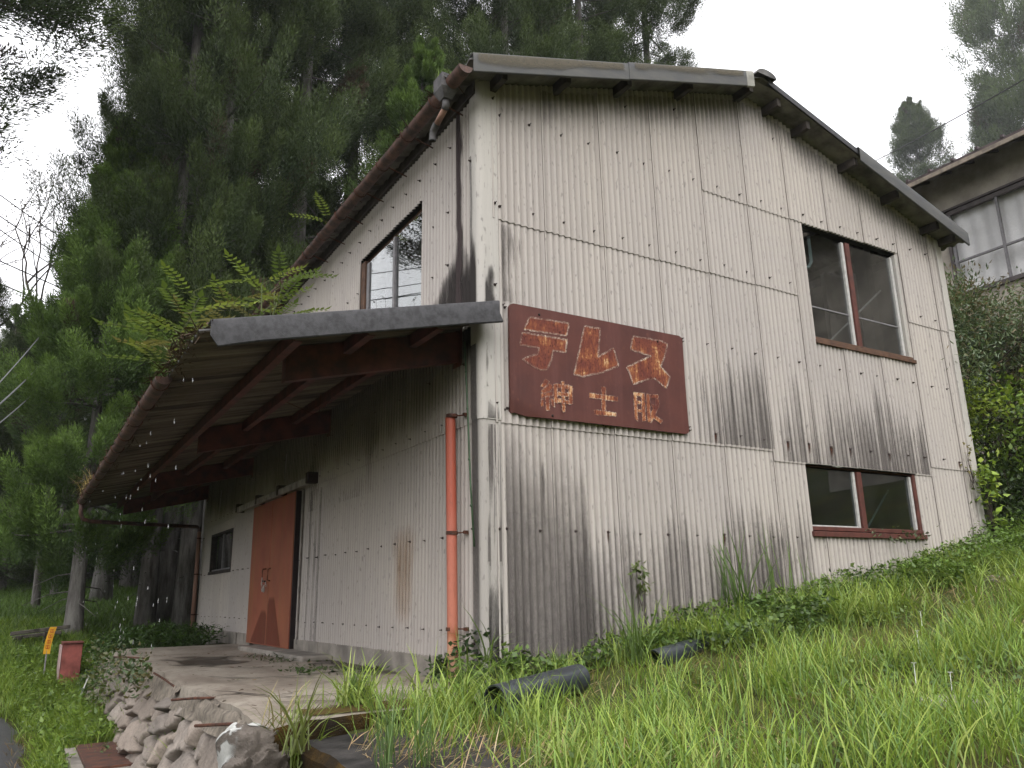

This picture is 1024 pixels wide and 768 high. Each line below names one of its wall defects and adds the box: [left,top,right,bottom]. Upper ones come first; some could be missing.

damp [439,112,514,304]
damp [470,343,815,681]
damp [716,373,930,475]